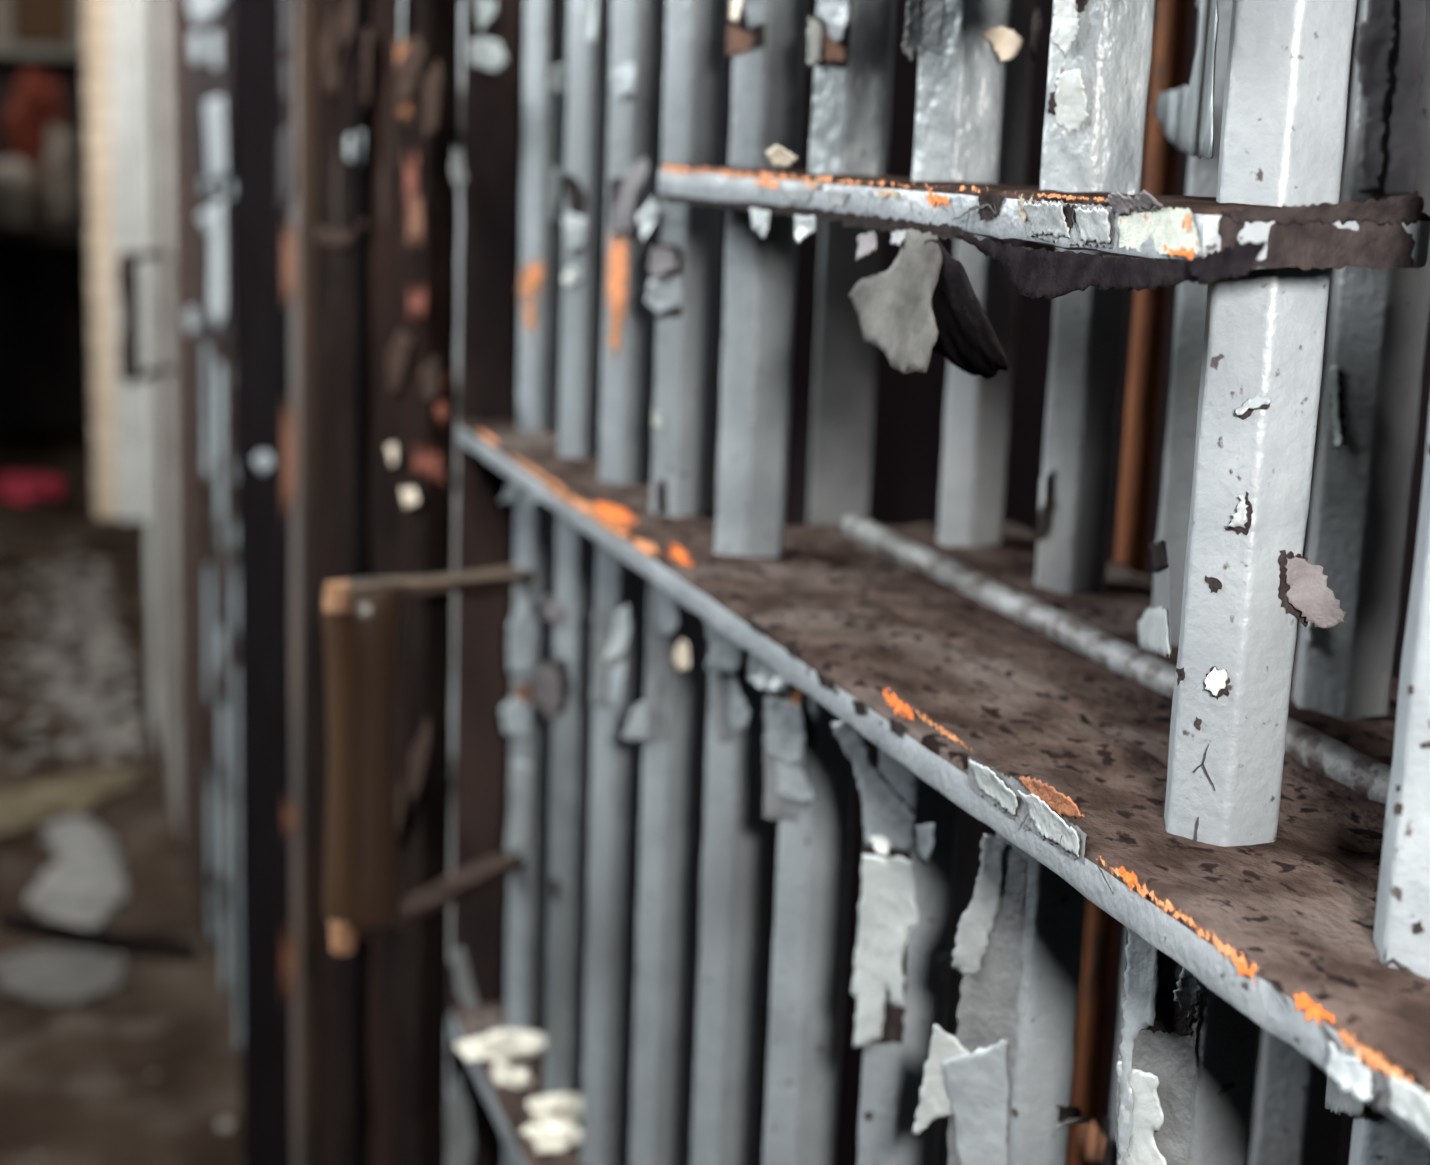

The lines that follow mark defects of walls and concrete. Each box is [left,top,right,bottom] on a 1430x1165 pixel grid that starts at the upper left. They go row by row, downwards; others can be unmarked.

rust [663,165,988,209]
peeling [609,0,1427,380]
rust [1018,192,1107,222]
rust [511,455,696,567]
spalling [1394,785,1403,816]
rust [1096,856,1258,984]
spalling [1413,920,1424,934]
peeling [913,834,1027,1165]
peeling [1054,927,1202,1165]
rust [1293,993,1413,1085]